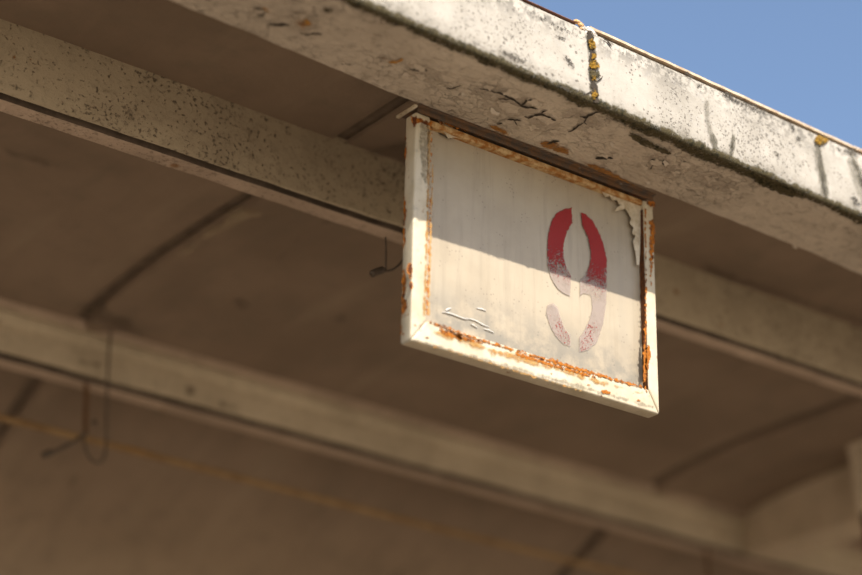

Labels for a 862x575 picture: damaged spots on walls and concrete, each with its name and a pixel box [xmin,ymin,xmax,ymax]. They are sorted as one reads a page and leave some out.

crack [481,31,612,144]
leakage [717,90,774,116]
leakage [817,145,827,198]
leakage [834,146,862,186]